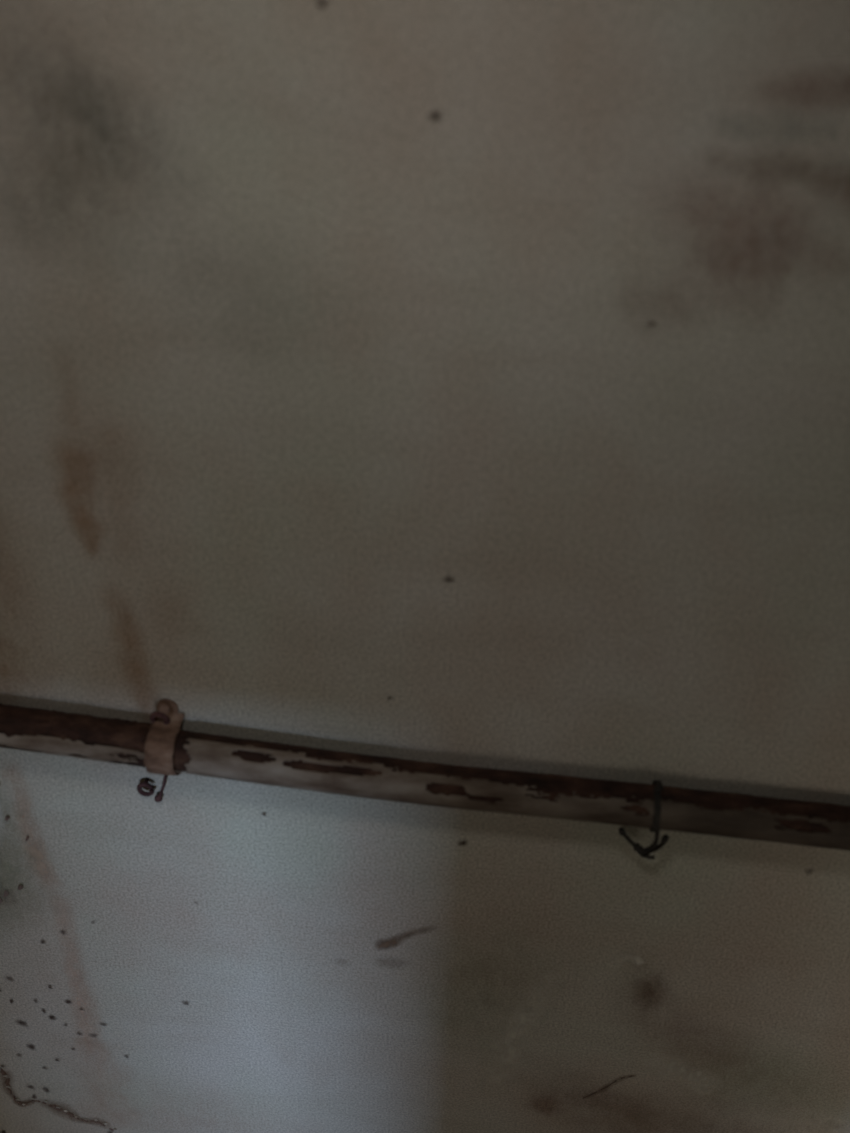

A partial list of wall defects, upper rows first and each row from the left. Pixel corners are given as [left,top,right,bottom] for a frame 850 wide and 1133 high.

rust [0,703,152,743]